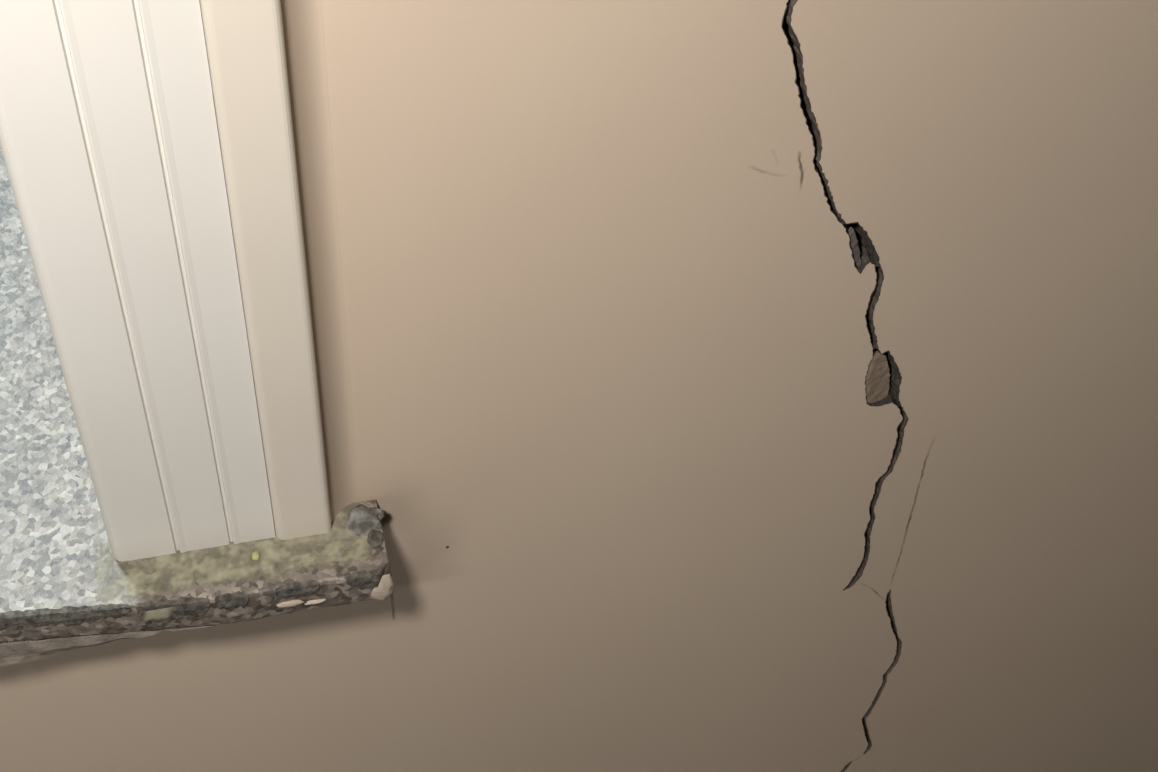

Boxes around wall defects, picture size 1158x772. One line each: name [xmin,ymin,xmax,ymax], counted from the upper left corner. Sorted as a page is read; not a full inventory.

crack [781,0,847,224]
crack [865,266,884,349]
crack [843,406,909,591]
crack [840,590,902,772]